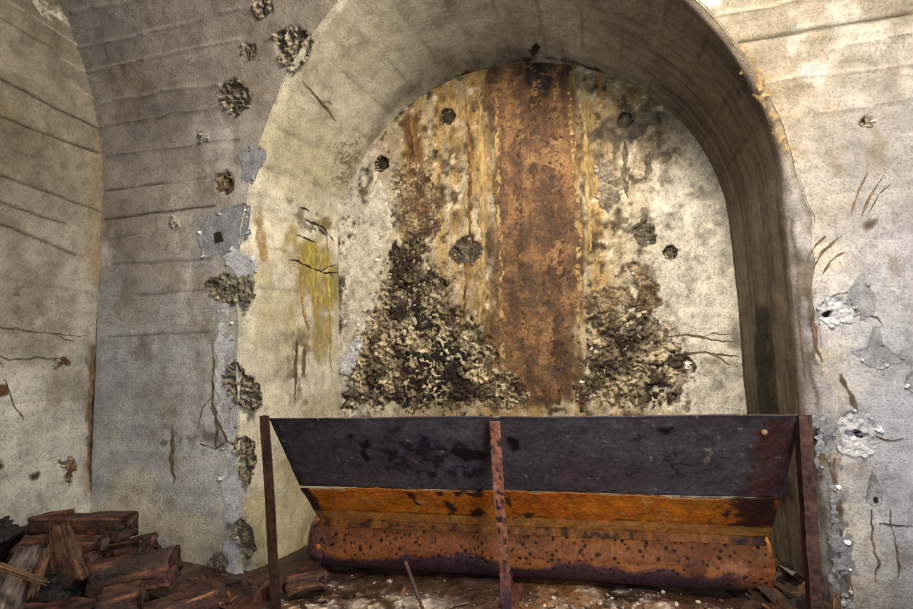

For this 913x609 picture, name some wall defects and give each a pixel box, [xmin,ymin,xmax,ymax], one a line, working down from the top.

crack [0,326,84,419]
crack [197,344,233,449]
peeling [196,203,263,574]
spalling [219,77,251,118]
peeling [215,145,267,194]
spalling [252,0,272,20]
spalling [271,26,314,72]
water stain [292,207,334,400]
water stain [438,66,496,335]
rust [483,62,586,409]
water stain [514,44,681,258]
peeling [812,409,904,609]